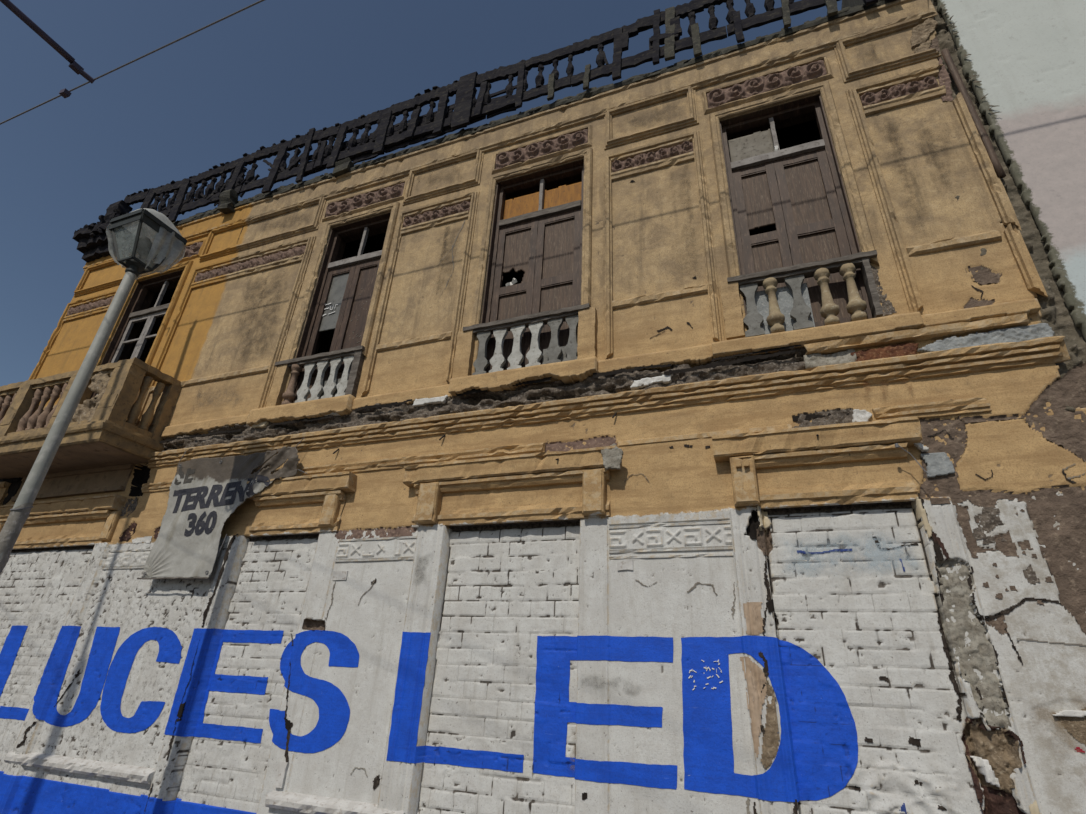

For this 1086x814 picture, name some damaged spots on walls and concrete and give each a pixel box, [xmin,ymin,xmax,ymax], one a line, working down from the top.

spalling [158,344,857,452]
spalling [792,408,872,428]
peeling [910,0,1086,814]
crack [166,534,238,761]
crack [284,634,293,762]
peeling [740,657,780,769]
crack [911,493,1086,721]